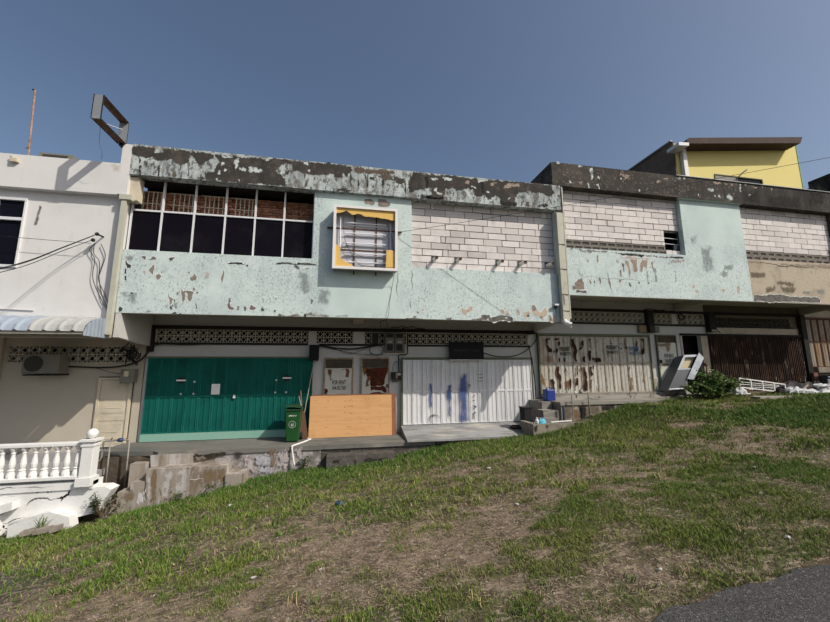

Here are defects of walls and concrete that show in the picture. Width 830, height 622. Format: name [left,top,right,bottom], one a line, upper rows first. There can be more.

peeling [132,146,559,208]
spalling [124,255,163,280]
spalling [167,271,209,314]
peeling [226,298,277,313]
spalling [460,305,557,323]
peeling [573,255,657,294]
leakage [767,281,824,294]
corrosion [541,337,601,391]
crack [0,486,71,528]